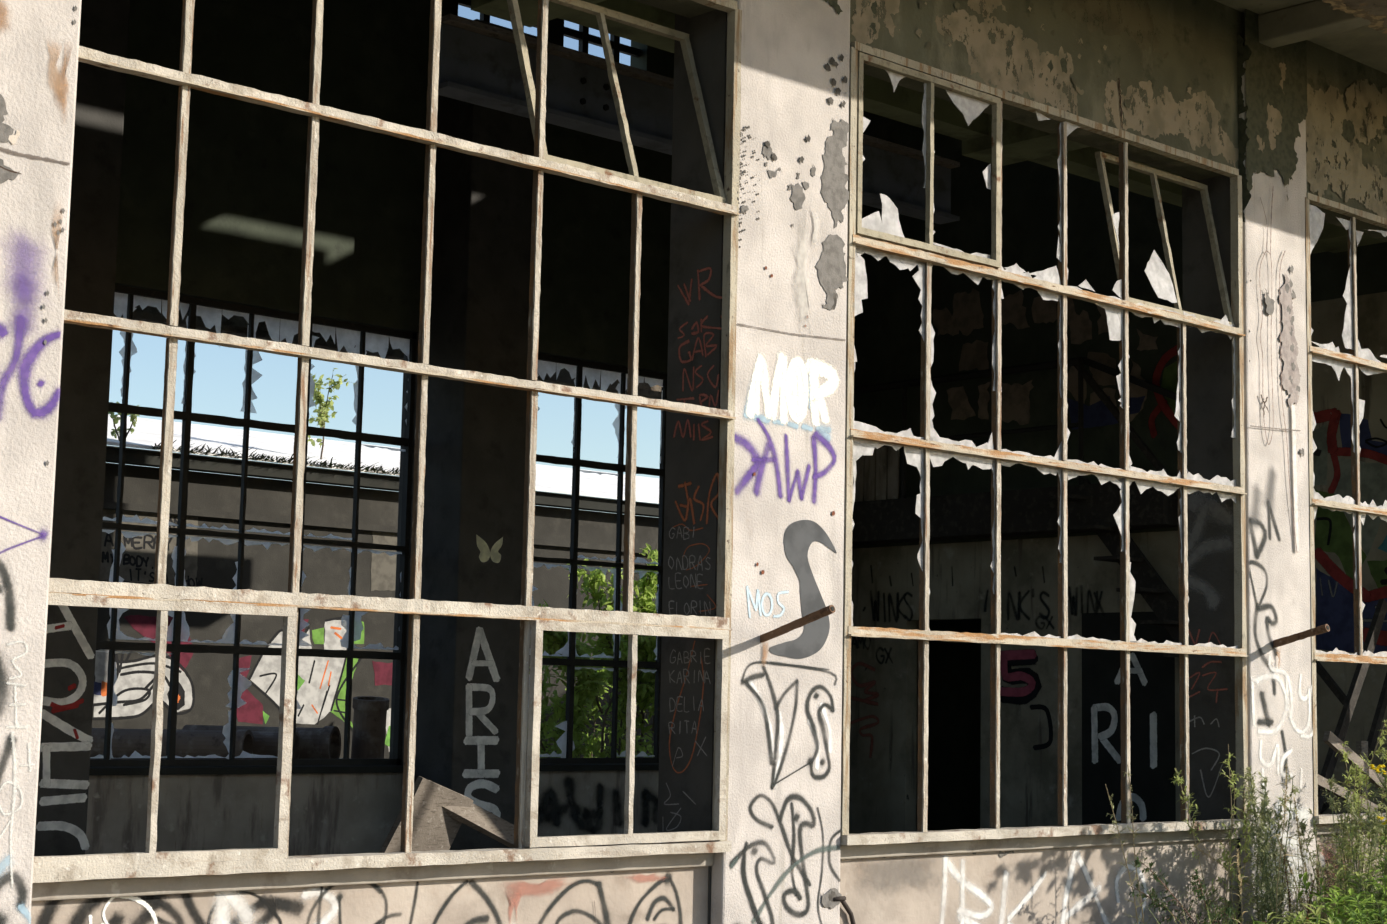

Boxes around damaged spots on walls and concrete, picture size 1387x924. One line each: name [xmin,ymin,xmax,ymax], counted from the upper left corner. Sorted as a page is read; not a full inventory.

spalling [0,94,20,145]
spalling [0,159,21,183]
peeling [737,54,849,310]
peeling [825,0,1387,222]